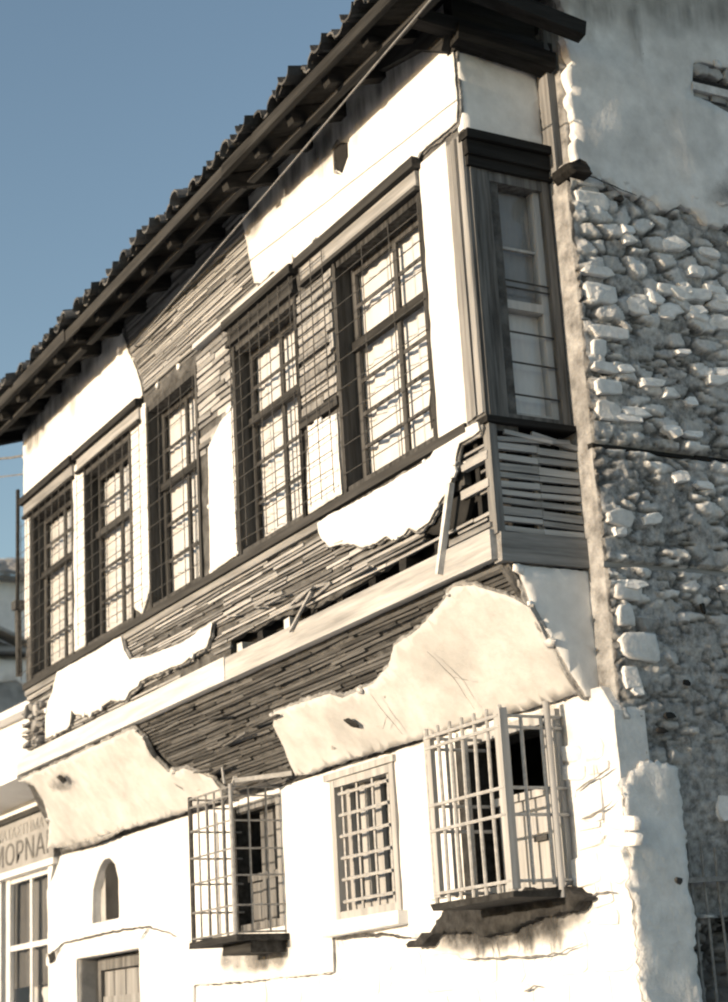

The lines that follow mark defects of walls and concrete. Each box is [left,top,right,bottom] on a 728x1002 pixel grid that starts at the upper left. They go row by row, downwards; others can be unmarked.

flaking render [691,60,728,112]
flaking render [26,268,599,751]
flaking render [139,587,448,805]
spalling [656,712,677,733]